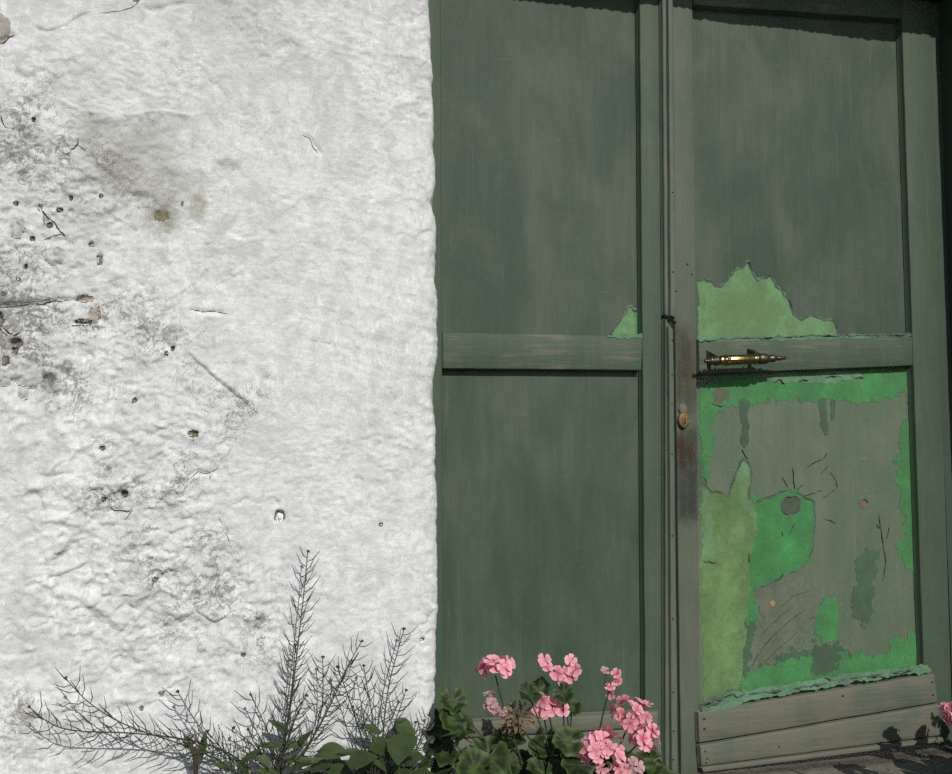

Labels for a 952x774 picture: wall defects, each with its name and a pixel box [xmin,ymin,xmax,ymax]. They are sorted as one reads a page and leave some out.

peeling [608,305,642,339]
peeling [697,260,912,343]
peeling [697,366,932,712]